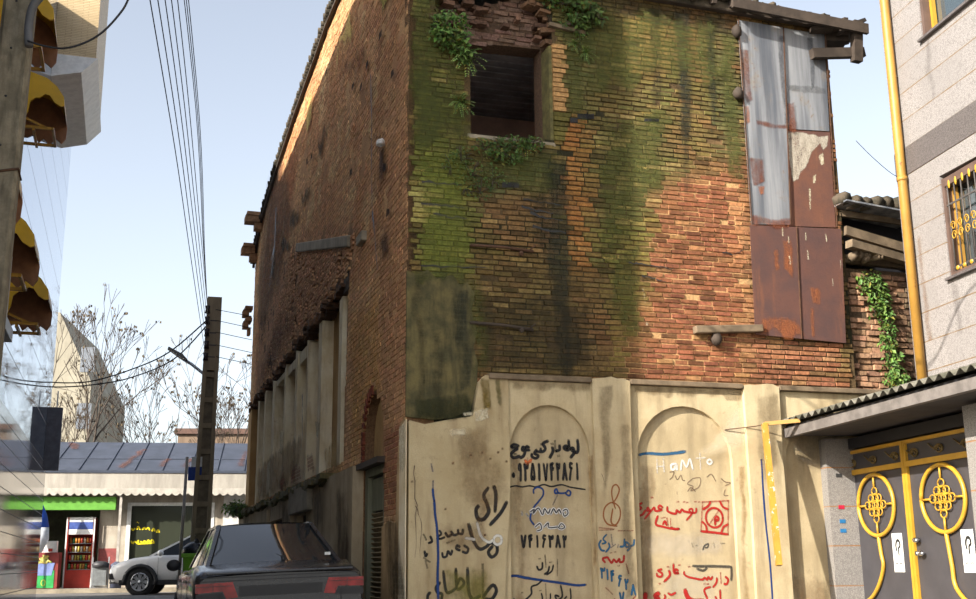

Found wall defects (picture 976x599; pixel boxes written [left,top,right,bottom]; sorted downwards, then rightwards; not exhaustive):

spalling [425,0,491,29]
spalling [500,0,557,49]
rust [761,104,796,132]
peeling [788,132,828,181]
water stain [416,380,501,419]